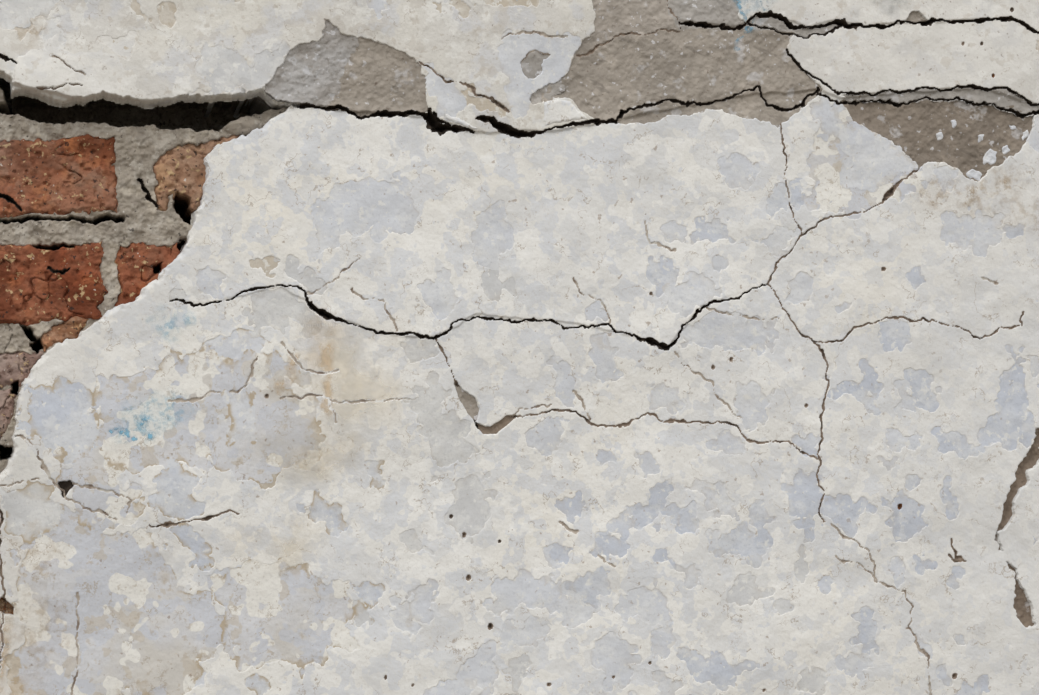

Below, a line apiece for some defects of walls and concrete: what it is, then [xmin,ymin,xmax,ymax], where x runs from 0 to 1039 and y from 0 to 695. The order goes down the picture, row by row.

crack [0,53,17,64]
crack [36,55,86,104]
crack [501,30,568,67]
crack [576,0,1039,57]
flaking render [195,0,1039,220]
crack [168,49,1039,695]
peeling [0,171,439,695]